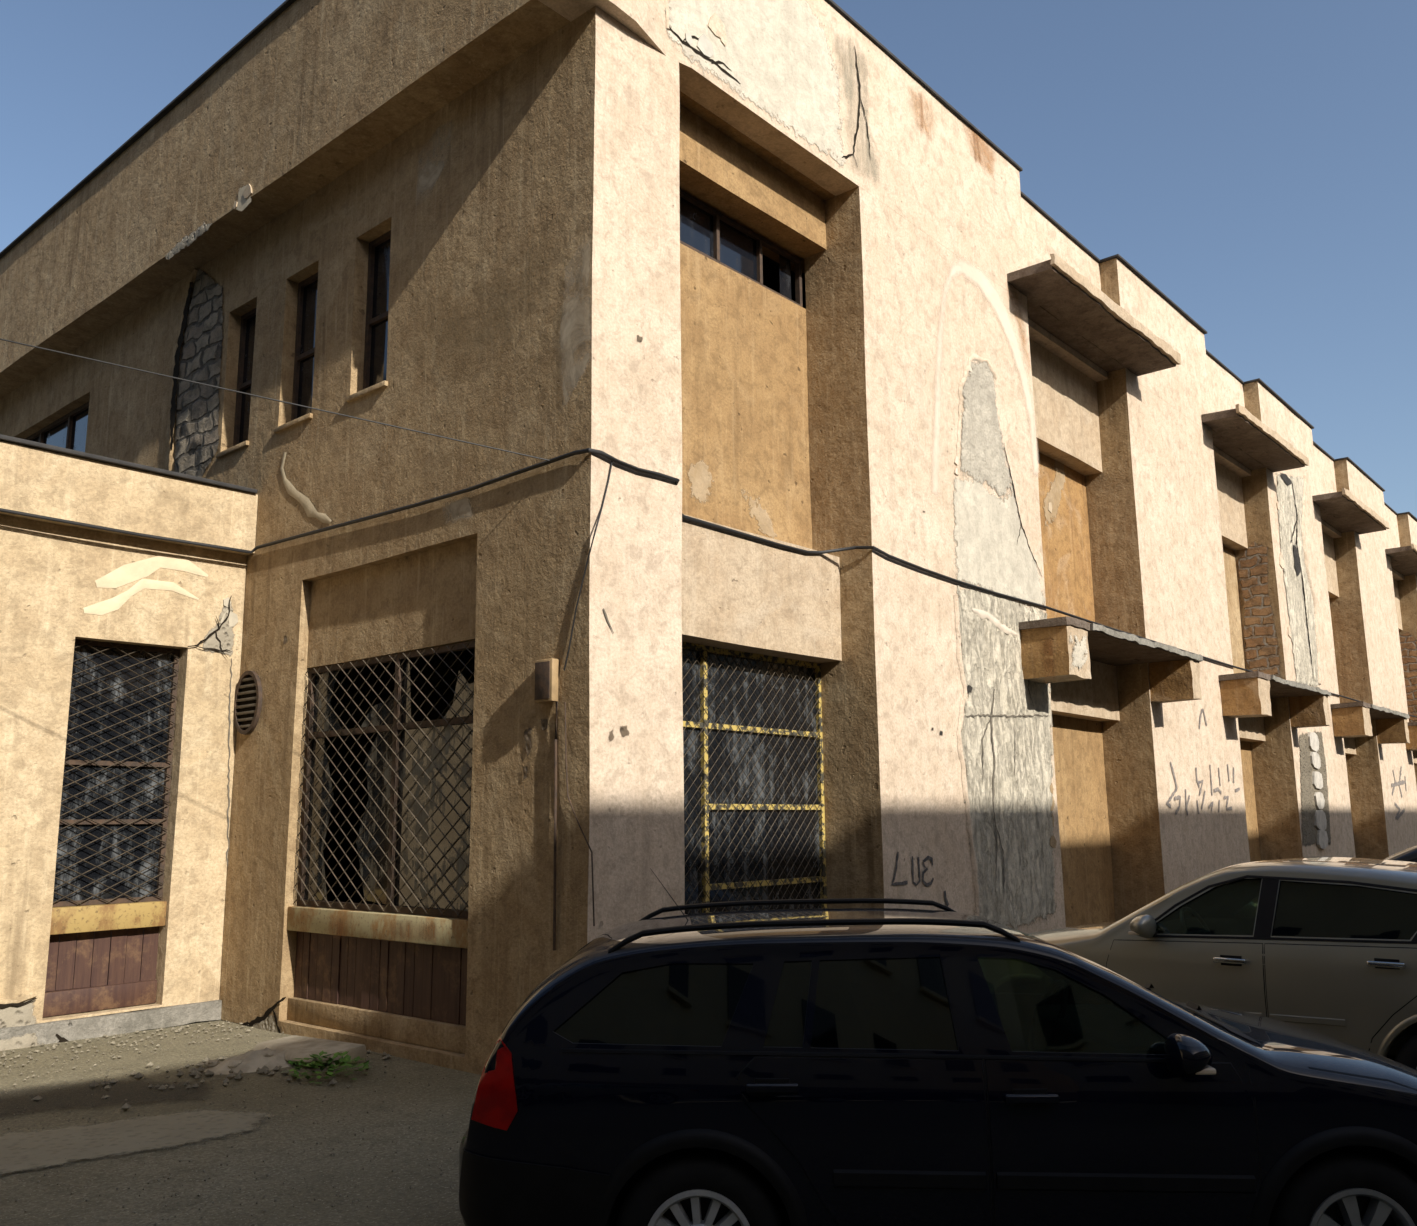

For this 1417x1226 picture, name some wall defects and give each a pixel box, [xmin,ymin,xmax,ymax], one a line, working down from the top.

crack [669,26,740,84]
peeling [664,0,846,168]
crack [842,46,871,167]
flaking render [168,269,223,477]
spalling [1238,472,1321,687]
crack [1291,483,1314,679]
crack [188,597,232,865]
crack [965,680,1049,892]
flaking render [1299,731,1331,849]
crack [0,998,37,1008]
crack [56,1034,68,1043]